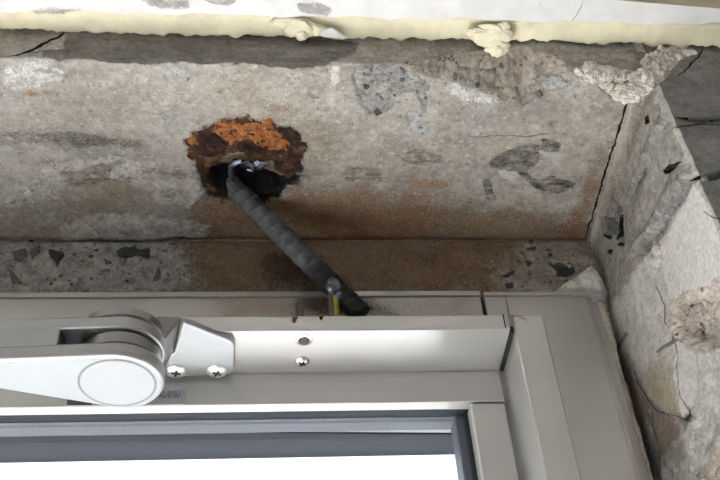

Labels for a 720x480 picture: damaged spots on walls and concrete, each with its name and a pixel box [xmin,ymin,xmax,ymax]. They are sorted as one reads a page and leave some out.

crack [10,32,65,57]
crack [678,48,704,76]
rust [148,74,355,323]
rust [302,238,533,316]
spalling [299,44,720,480]
crack [584,103,628,239]
crack [634,287,713,437]